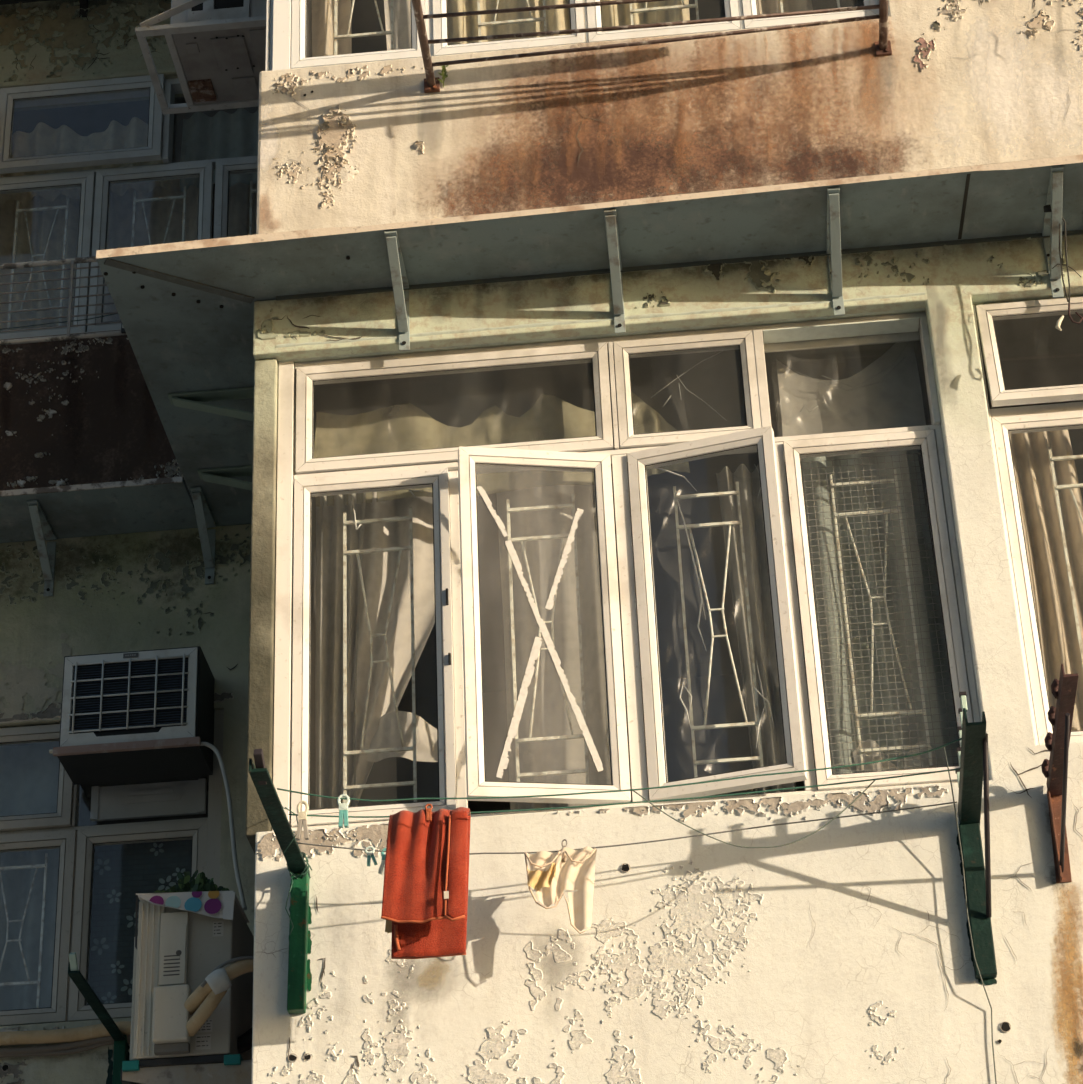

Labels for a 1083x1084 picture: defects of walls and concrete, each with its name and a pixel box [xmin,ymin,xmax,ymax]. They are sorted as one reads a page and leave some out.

peeling [0,0,171,82]
flaking render [913,0,991,72]
peeling [1019,0,1083,51]
peeling [272,105,358,209]
corrosion [443,27,904,217]
corrosion [0,330,193,501]
flaking render [599,785,948,822]
peeling [343,976,439,1084]
peeling [462,860,800,1084]
crack [856,882,963,1008]
crack [1004,863,1031,960]
corrosion [1055,890,1083,1083]